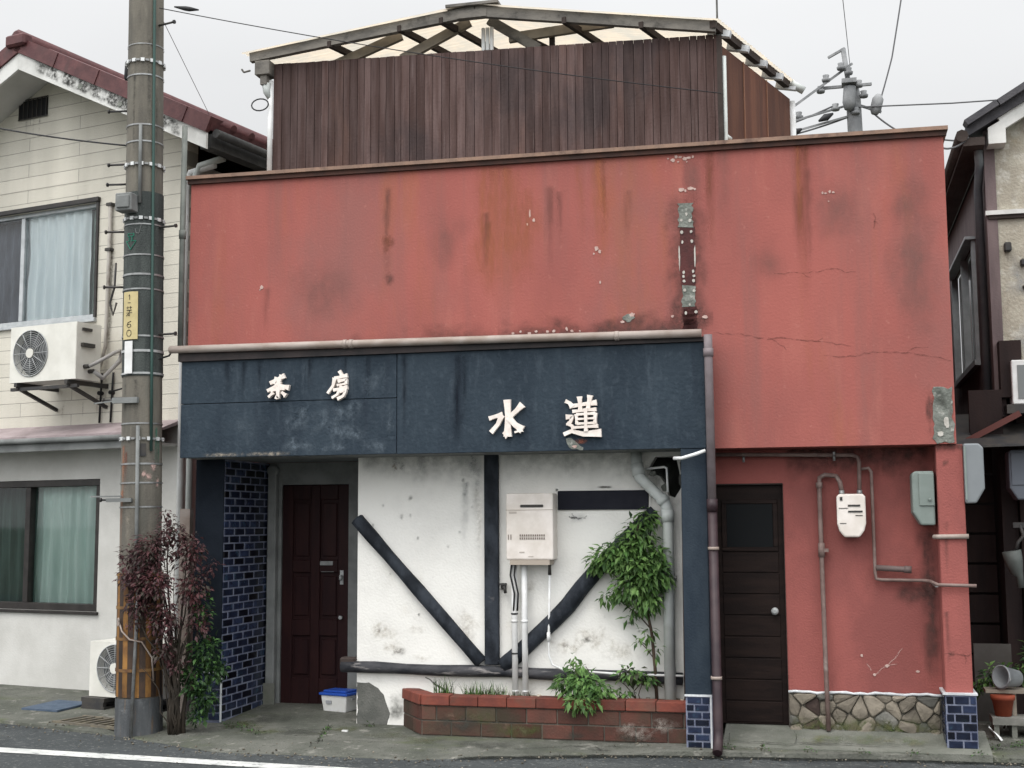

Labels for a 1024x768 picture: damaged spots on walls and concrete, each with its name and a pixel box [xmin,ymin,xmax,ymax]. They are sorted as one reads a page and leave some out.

spalling [927,387,955,444]
peeling [356,682,399,725]